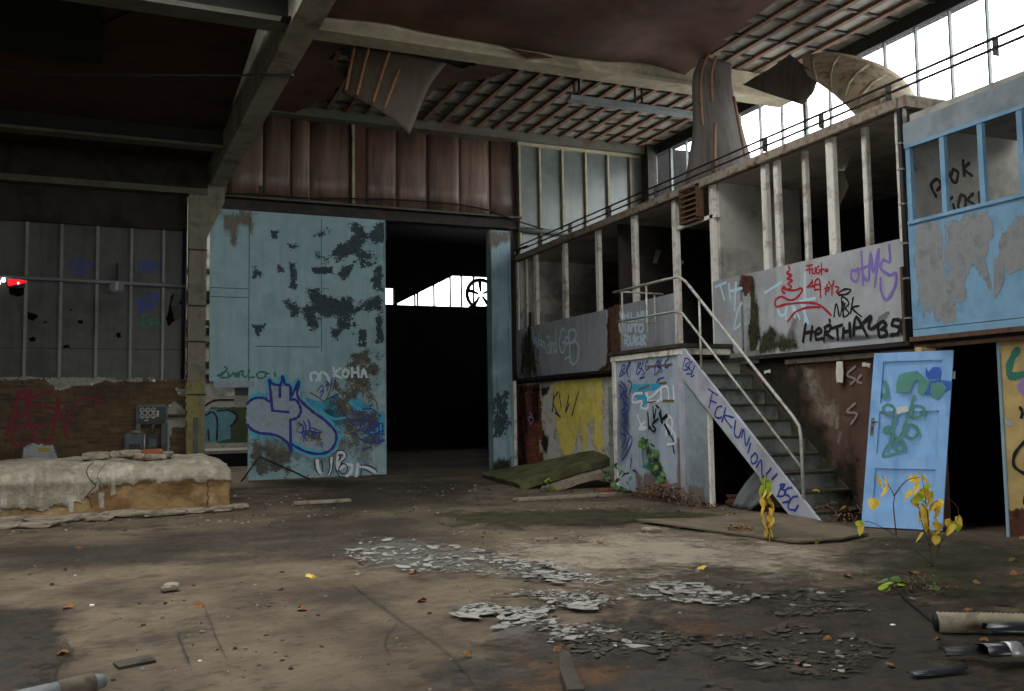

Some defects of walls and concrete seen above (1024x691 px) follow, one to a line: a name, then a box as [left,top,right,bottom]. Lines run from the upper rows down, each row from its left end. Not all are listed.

rust [223,210,254,246]
peeling [913,210,1024,324]
peeling [245,220,393,480]
water stain [824,335,876,343]
peeling [21,443,58,458]
peeling [0,376,204,454]
peeling [491,377,611,465]